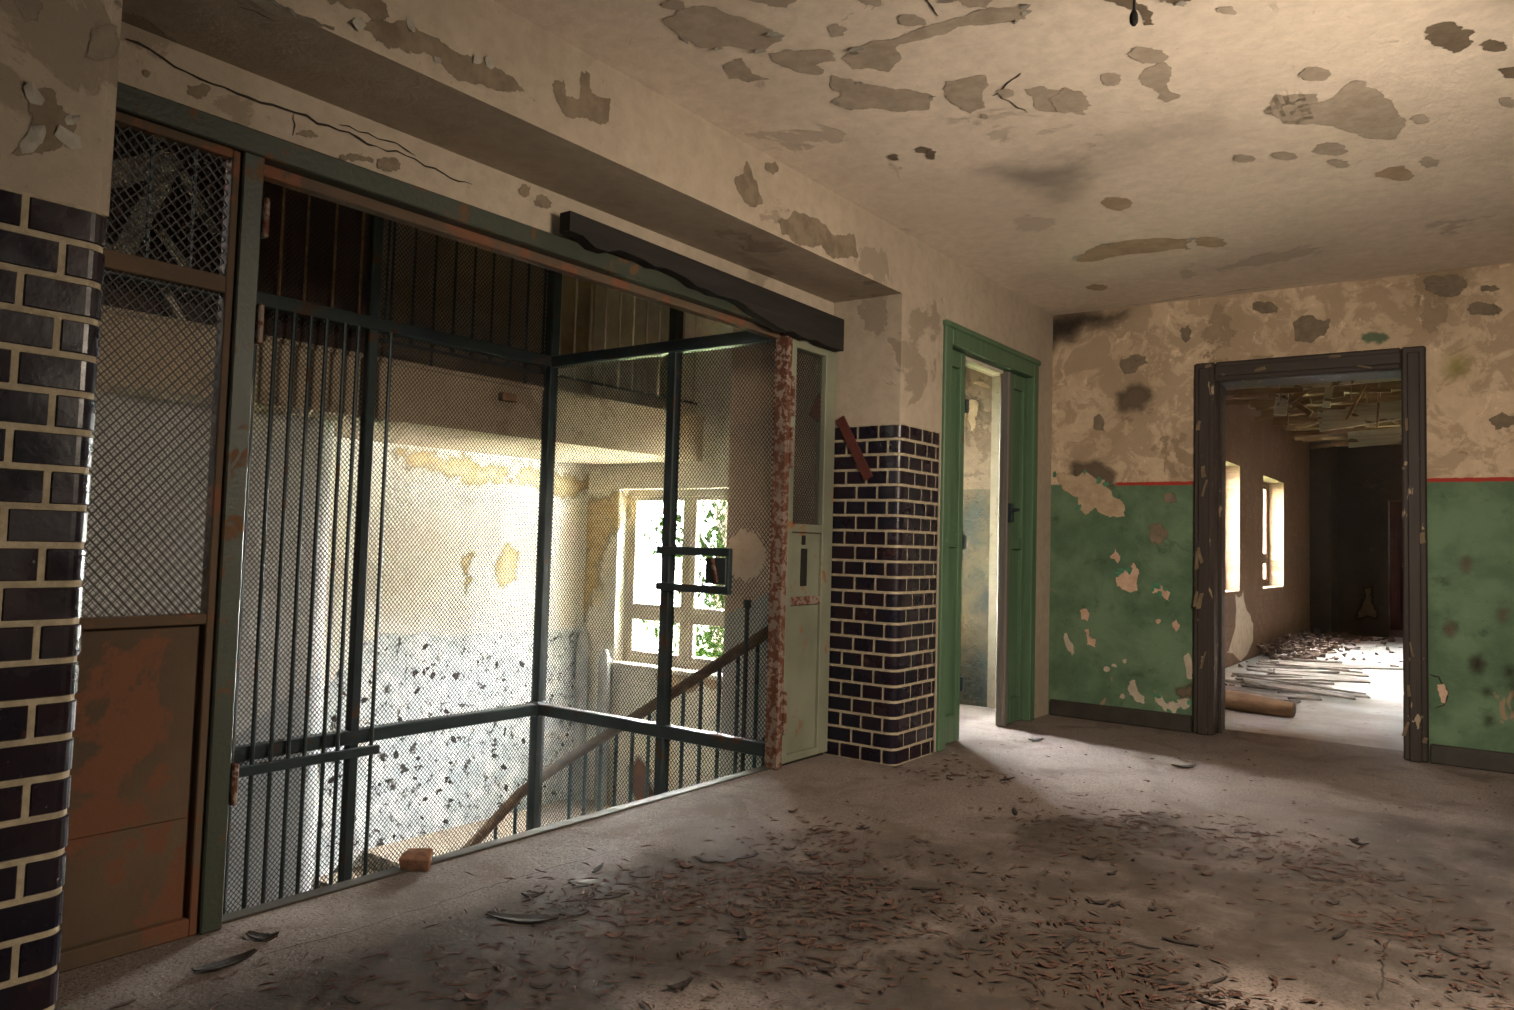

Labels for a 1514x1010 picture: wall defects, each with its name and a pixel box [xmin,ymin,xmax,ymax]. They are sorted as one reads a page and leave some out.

peeling [1105,0,1191,25]
crack [125,38,470,184]
flaking render [328,0,535,101]
flaking render [552,71,611,125]
peeling [661,0,1091,119]
peeling [1128,47,1180,102]
peeling [1233,67,1430,168]
peeling [1425,21,1514,79]
peeling [1073,237,1228,262]
flaking render [1053,470,1125,517]
flaking render [1227,593,1253,661]
peeling [1103,652,1206,713]